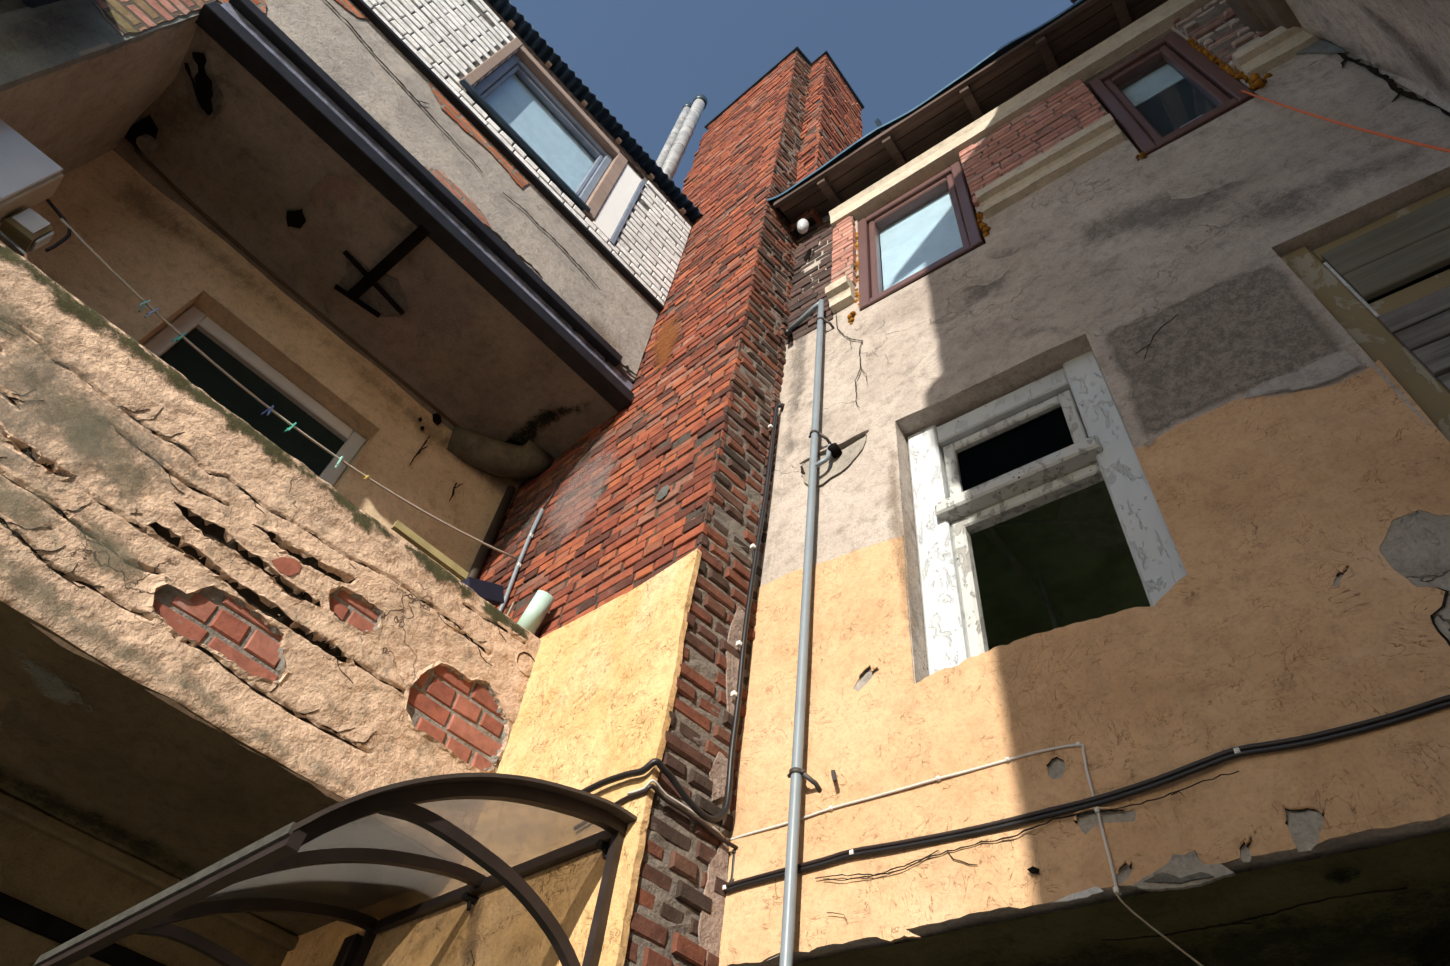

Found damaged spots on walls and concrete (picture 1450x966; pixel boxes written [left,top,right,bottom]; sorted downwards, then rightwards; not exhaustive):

flaking render [92,0,229,36]
flaking render [334,0,370,21]
crack [1330,42,1450,117]
crack [835,311,867,408]
crack [1,329,524,666]
crack [0,457,375,753]
flaking render [145,497,385,686]
peeling [1380,510,1450,646]
crack [334,656,402,692]
flaking render [404,661,511,773]
flaking render [1050,834,1252,905]
peeling [1281,804,1325,853]